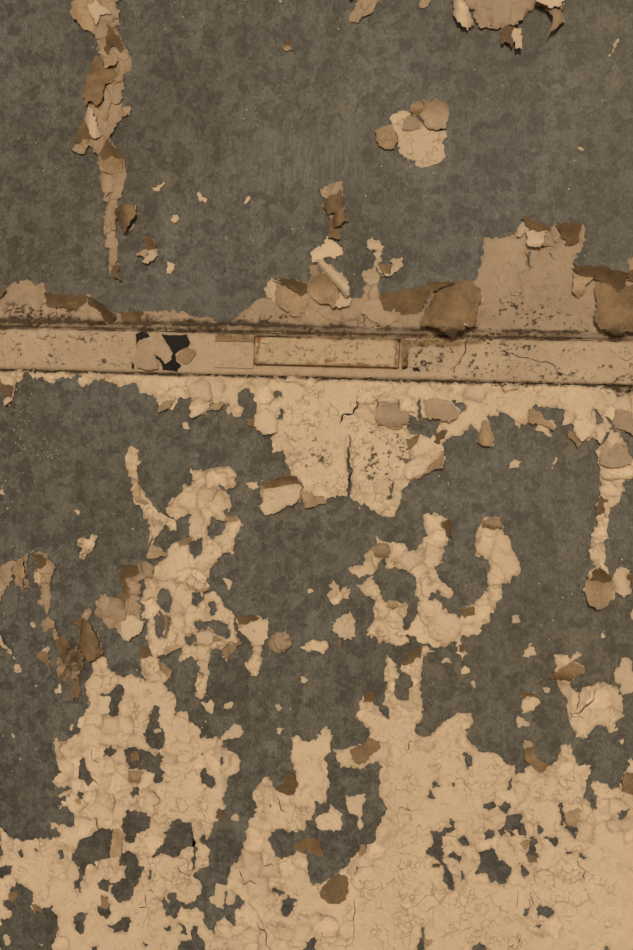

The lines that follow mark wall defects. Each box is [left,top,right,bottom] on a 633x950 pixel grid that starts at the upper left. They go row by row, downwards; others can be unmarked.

peeling [70,0,140,280]
peeling [348,0,381,23]
peeling [374,98,450,168]
peeling [453,0,565,49]
peeling [0,181,633,610]
peeling [0,446,633,950]